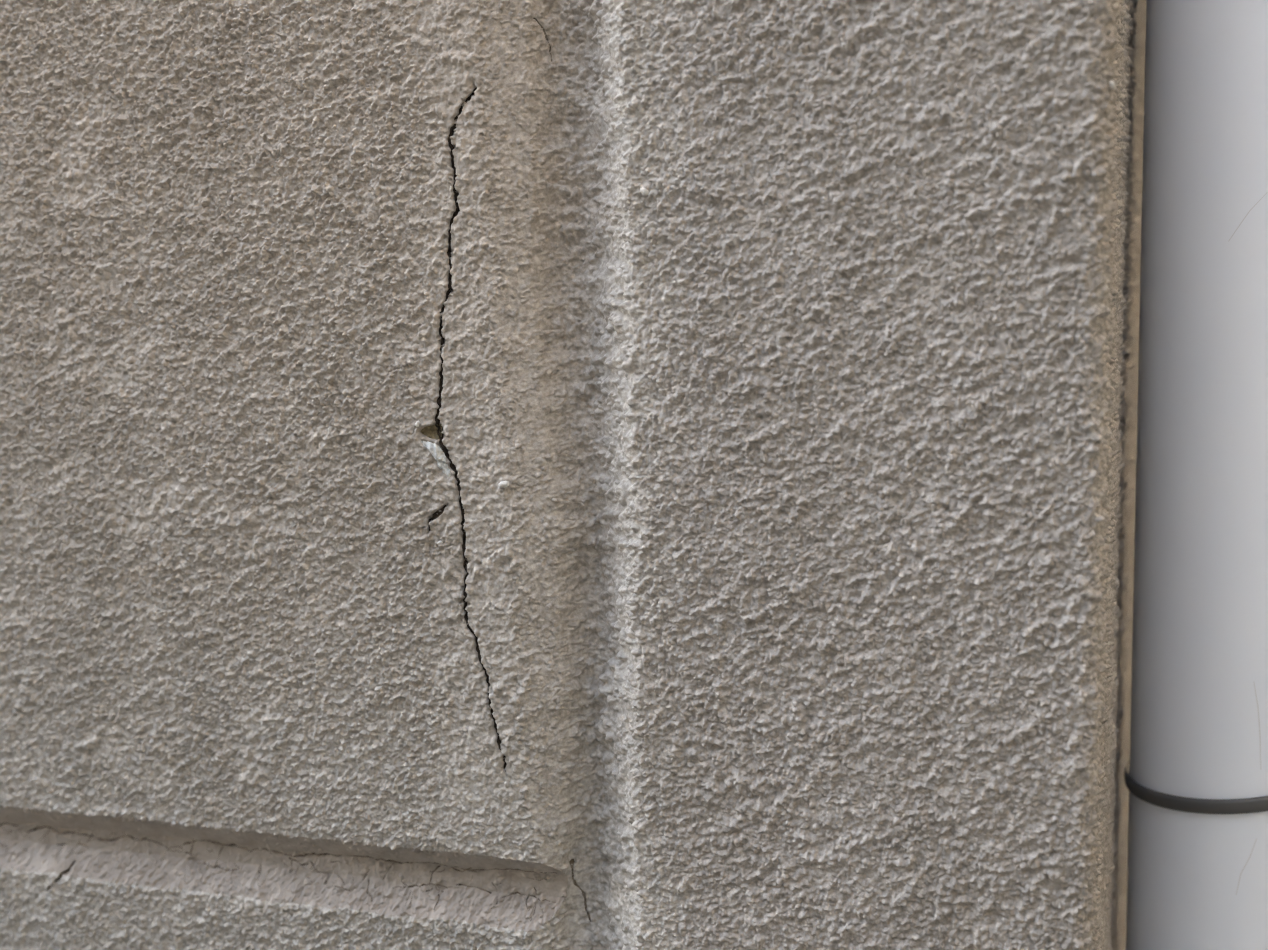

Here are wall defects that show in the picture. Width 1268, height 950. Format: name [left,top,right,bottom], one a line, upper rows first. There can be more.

crack [435,87,507,772]